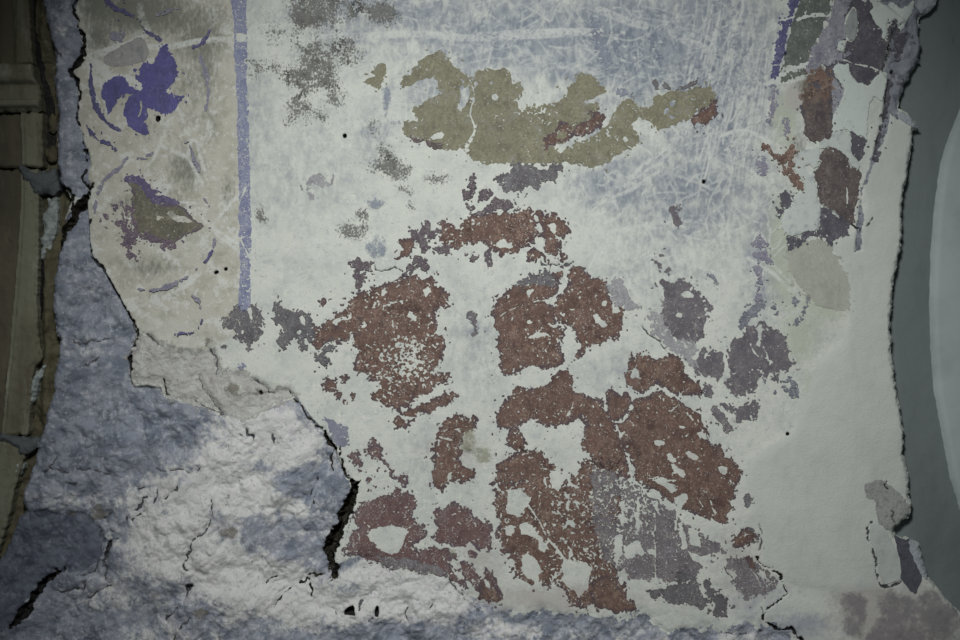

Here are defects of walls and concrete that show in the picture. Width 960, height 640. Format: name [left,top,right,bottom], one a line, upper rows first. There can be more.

crack [32,0,158,384]
peeling [769,0,921,326]
crack [44,456,110,486]
crack [9,468,200,629]
crack [165,495,229,640]
crack [195,345,224,416]
crack [239,428,276,443]
crack [256,379,360,607]
spalling [0,49,805,640]
spalling [865,480,922,594]